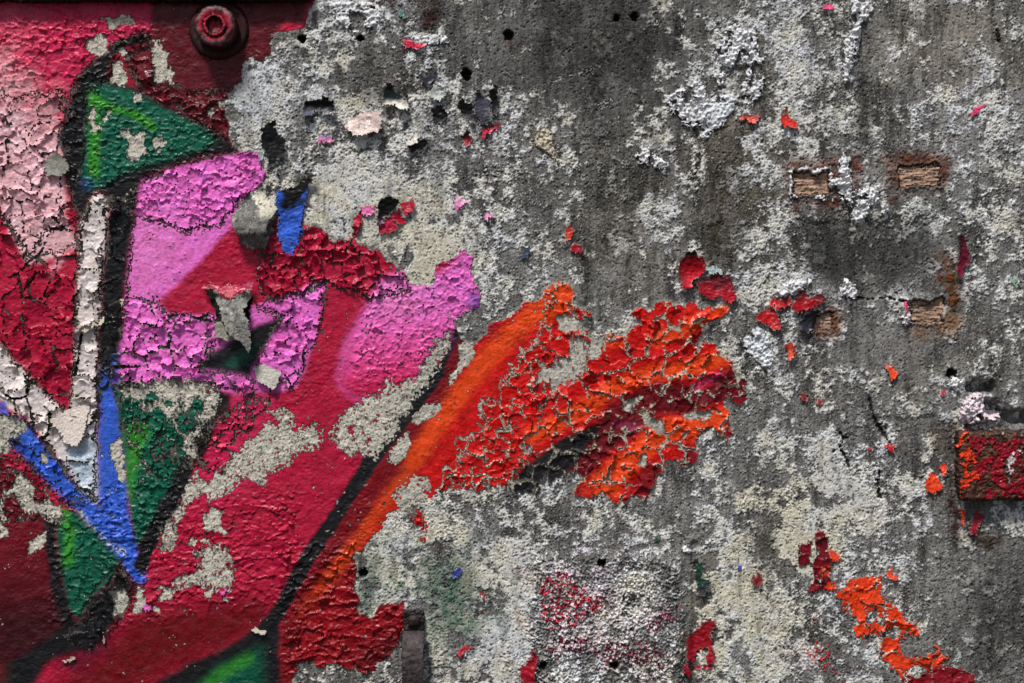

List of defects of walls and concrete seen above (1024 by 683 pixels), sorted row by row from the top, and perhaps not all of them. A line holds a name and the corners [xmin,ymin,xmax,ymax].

peeling [420,72,501,147]
crack [9,207,92,336]
spalling [756,215,933,334]
crack [74,333,83,376]
peeling [0,14,476,649]
peeling [393,250,748,542]
crack [832,428,850,468]
crack [875,470,883,498]
crack [868,397,891,445]
peeling [797,523,975,683]
peeling [683,618,717,677]